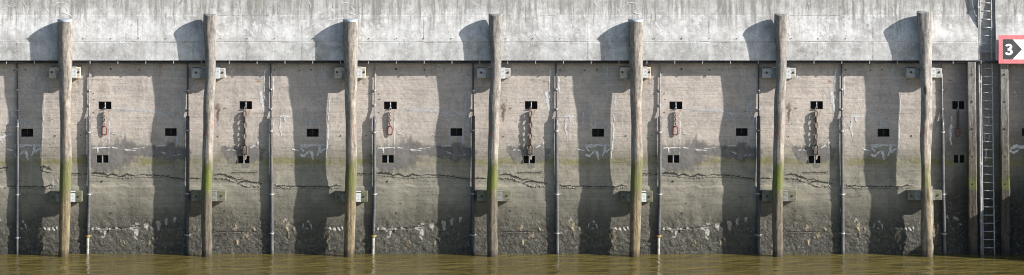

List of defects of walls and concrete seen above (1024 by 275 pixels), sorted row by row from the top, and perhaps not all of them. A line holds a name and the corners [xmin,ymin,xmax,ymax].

crack [0,165,915,190]